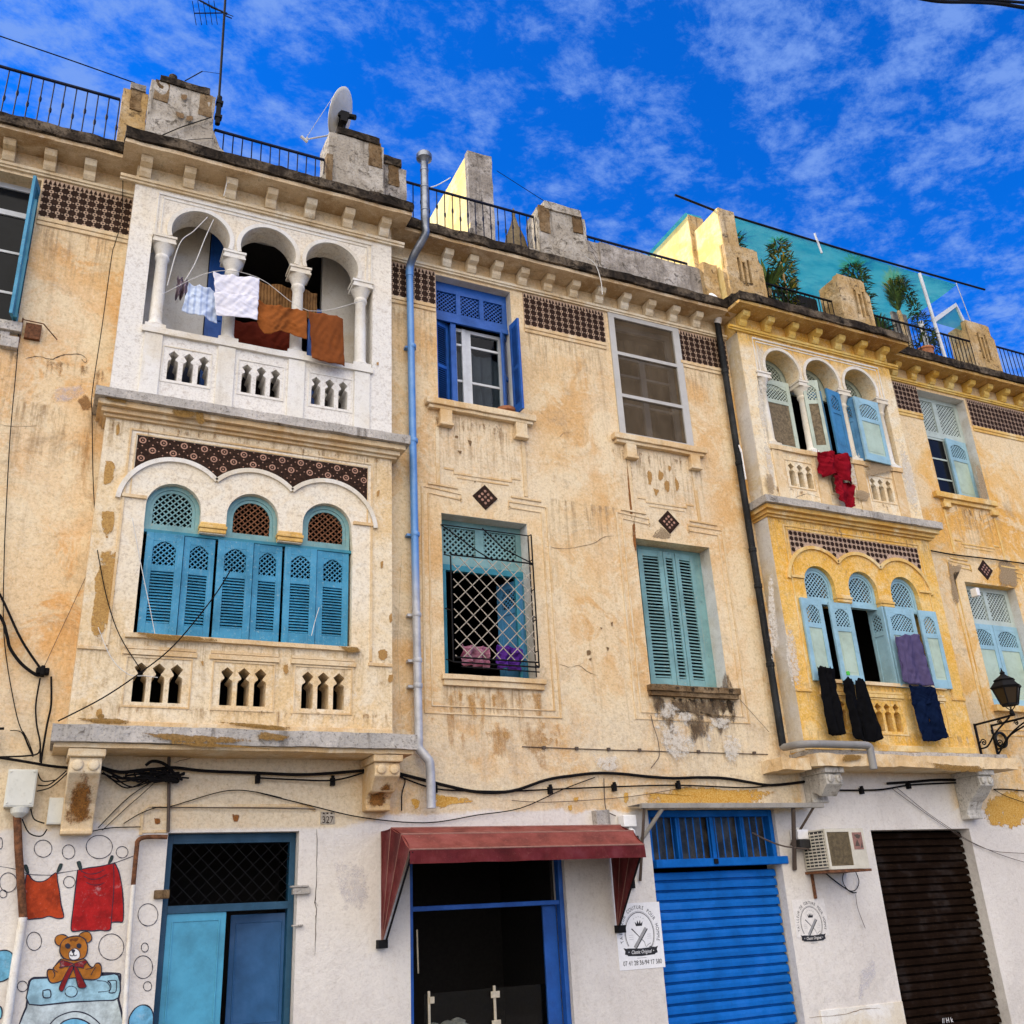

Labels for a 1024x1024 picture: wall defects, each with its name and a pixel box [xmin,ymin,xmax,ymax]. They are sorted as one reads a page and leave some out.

flaking render [91,511,118,637]
peeling [594,755,618,771]
peeling [655,703,742,766]
peeling [985,791,1024,829]